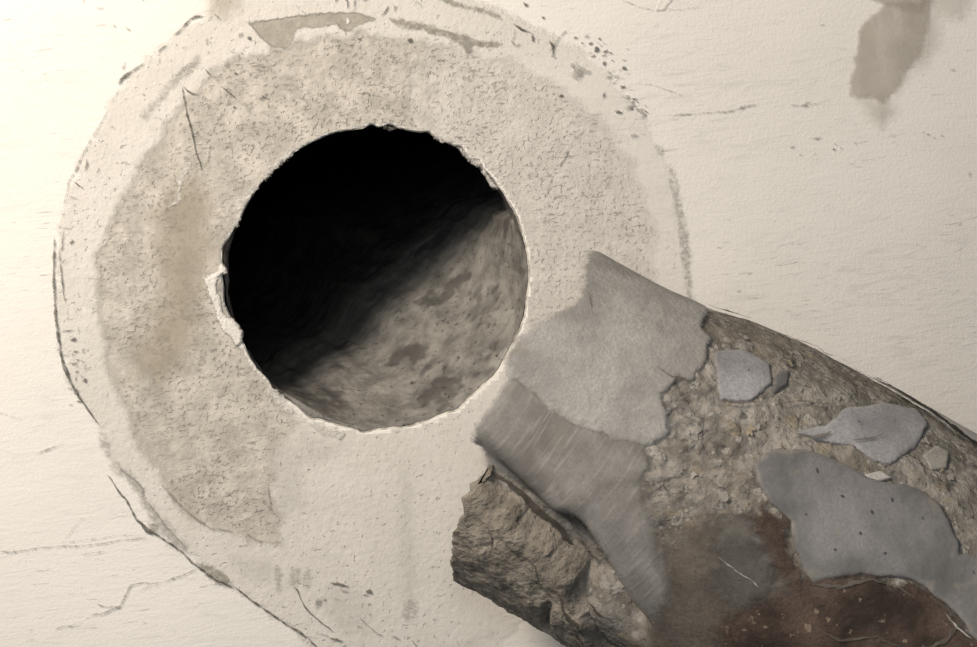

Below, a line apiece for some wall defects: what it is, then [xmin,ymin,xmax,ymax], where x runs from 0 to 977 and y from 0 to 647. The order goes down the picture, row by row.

damp [851,0,929,116]
damp [628,512,769,647]